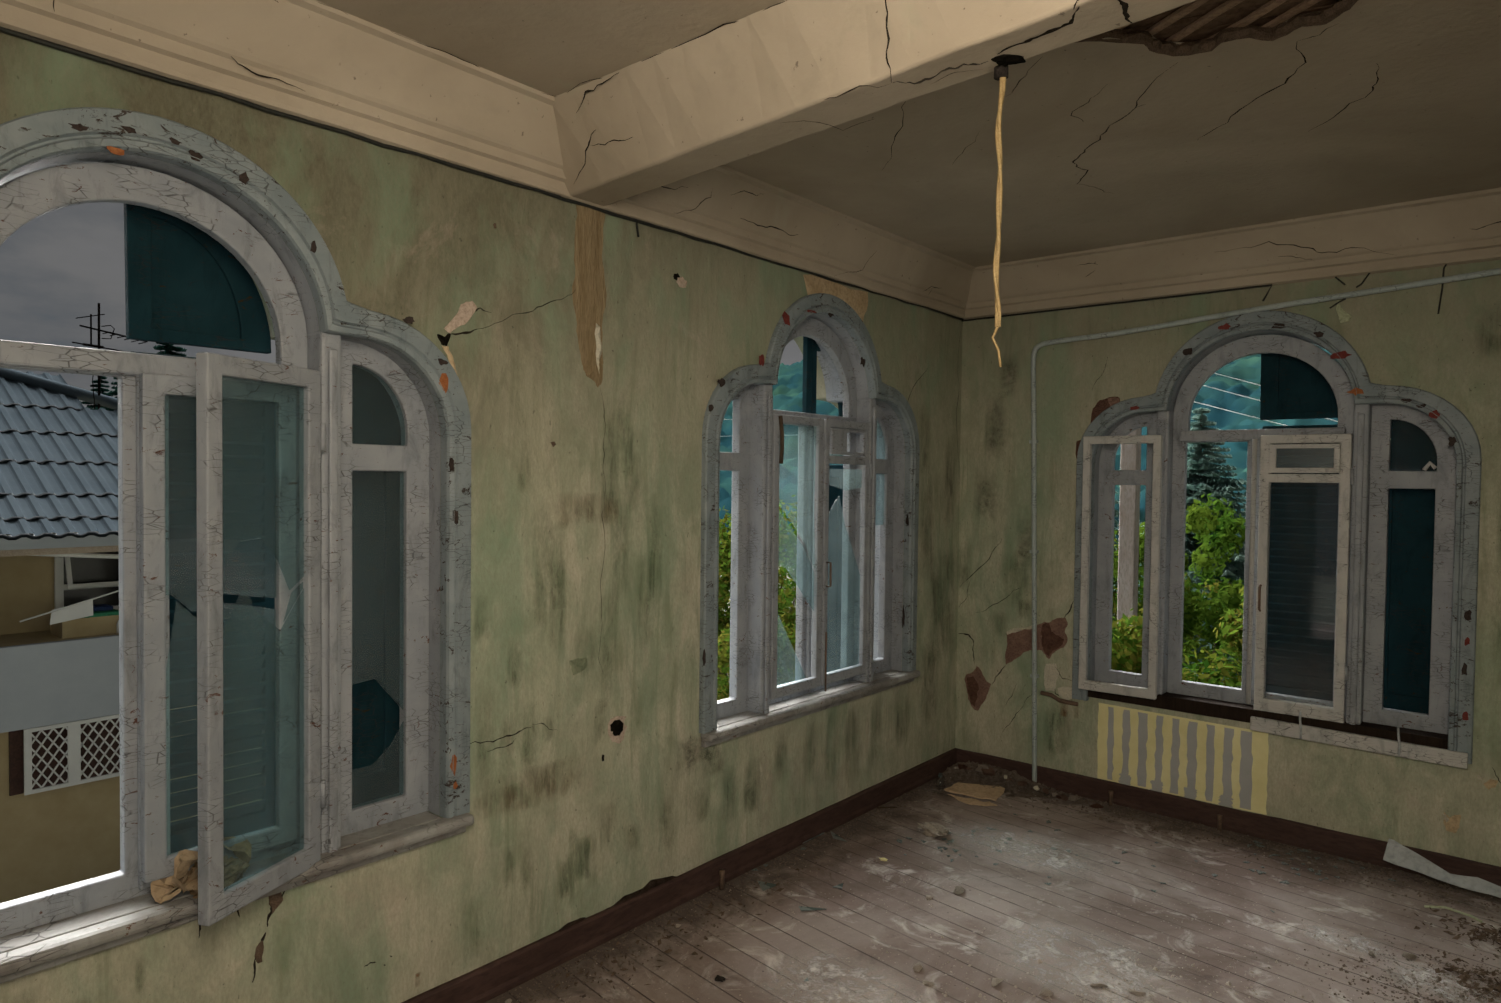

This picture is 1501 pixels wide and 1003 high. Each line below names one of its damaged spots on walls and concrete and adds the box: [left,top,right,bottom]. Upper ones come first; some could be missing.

crack [1118,0,1132,23]
spalling [1075,0,1358,56]
crack [541,0,787,183]
crack [784,0,1079,170]
crack [1071,63,1177,193]
crack [1202,26,1332,137]
crack [1309,64,1379,131]
crack [452,292,574,335]
peeling [572,204,607,387]
spalling [964,666,991,711]
spalling [1005,618,1072,700]
crack [237,891,285,983]